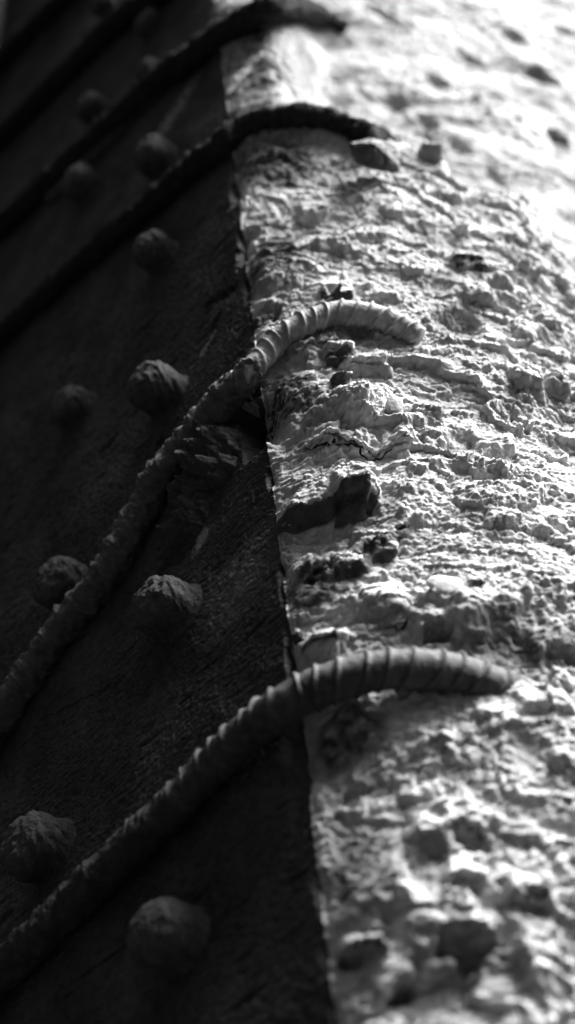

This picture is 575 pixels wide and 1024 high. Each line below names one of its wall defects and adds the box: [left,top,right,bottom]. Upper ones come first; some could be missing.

crack [294,433,408,468]